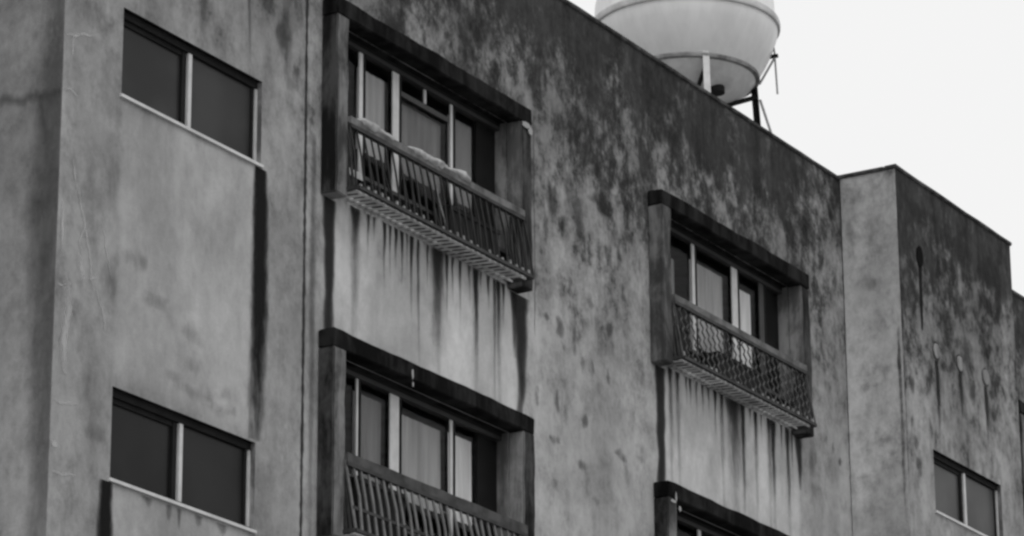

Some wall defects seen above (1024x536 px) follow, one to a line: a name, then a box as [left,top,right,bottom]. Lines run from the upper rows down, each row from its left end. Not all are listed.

leakage [251,166,268,427]
leakage [350,205,527,413]
leakage [656,365,802,482]